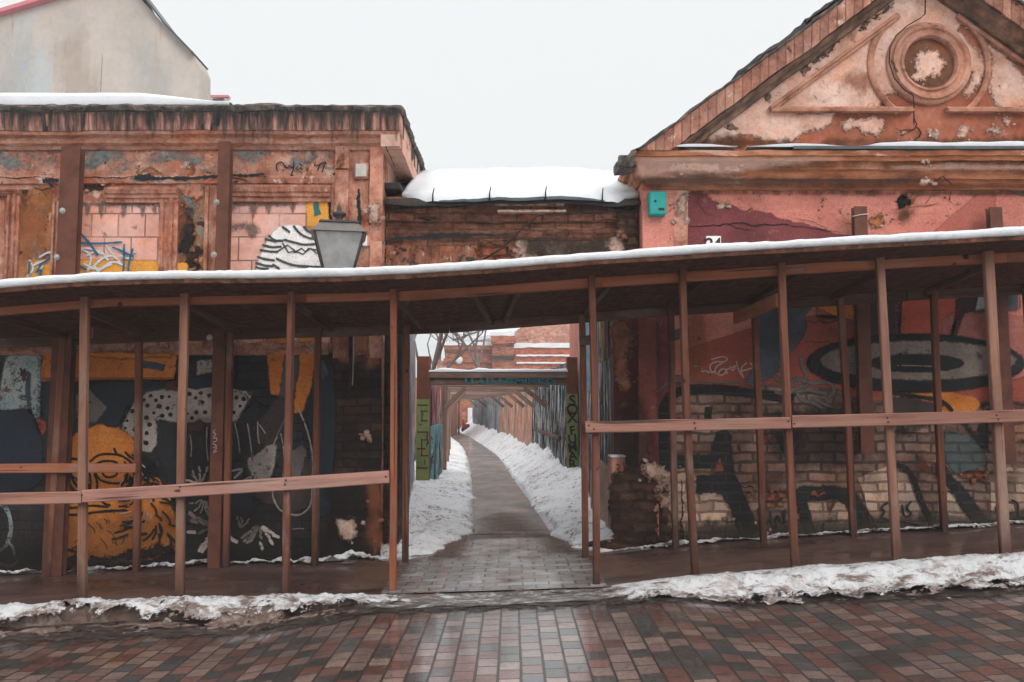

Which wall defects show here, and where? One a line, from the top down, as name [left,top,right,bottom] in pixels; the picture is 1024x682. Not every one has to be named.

flaking render [911,47,947,86]
flaking render [840,102,885,139]
spalling [133,167,164,176]
spalling [175,176,205,271]
crack [690,198,852,232]
spalling [894,192,915,209]
flaking render [335,516,365,544]